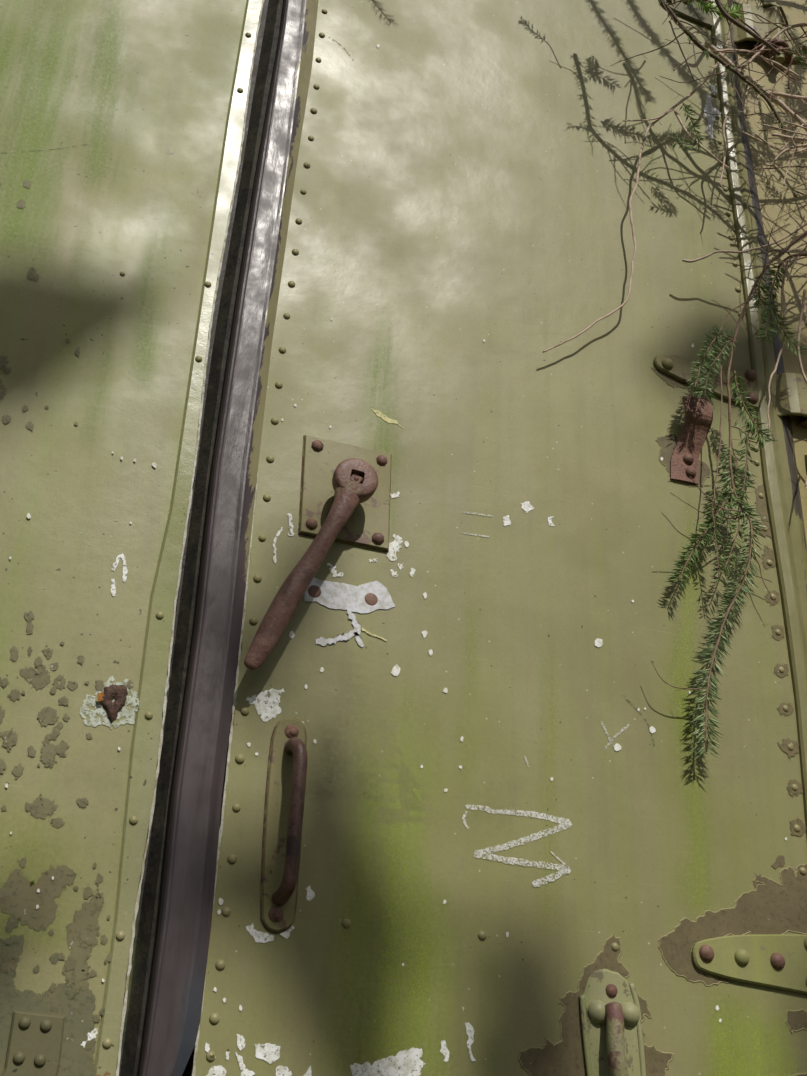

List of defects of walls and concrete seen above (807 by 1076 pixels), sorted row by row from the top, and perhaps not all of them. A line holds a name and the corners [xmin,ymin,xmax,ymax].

peeling [655,433,712,488]
peeling [369,534,416,577]
peeling [304,563,395,647]
peeling [0,611,105,780]
rust [80,676,139,729]
peeling [25,794,65,828]
peeling [657,855,807,987]
peeling [0,857,113,1076]
peeling [518,932,674,1076]
peeling [205,1034,311,1076]
peeling [350,1047,426,1076]